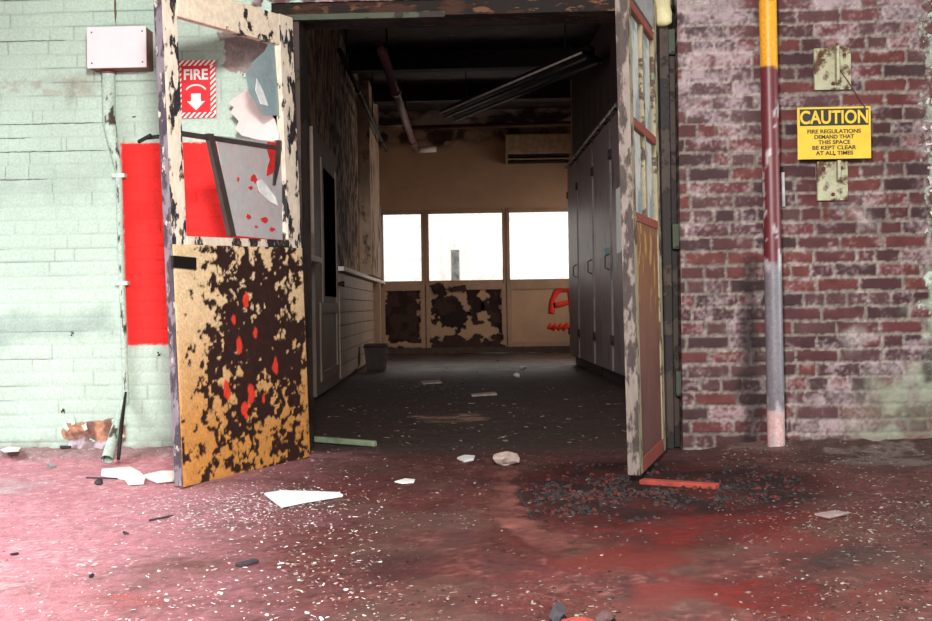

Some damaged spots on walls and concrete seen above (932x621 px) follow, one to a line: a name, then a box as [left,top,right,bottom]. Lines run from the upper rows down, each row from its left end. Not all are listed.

spalling [61,409,127,450]